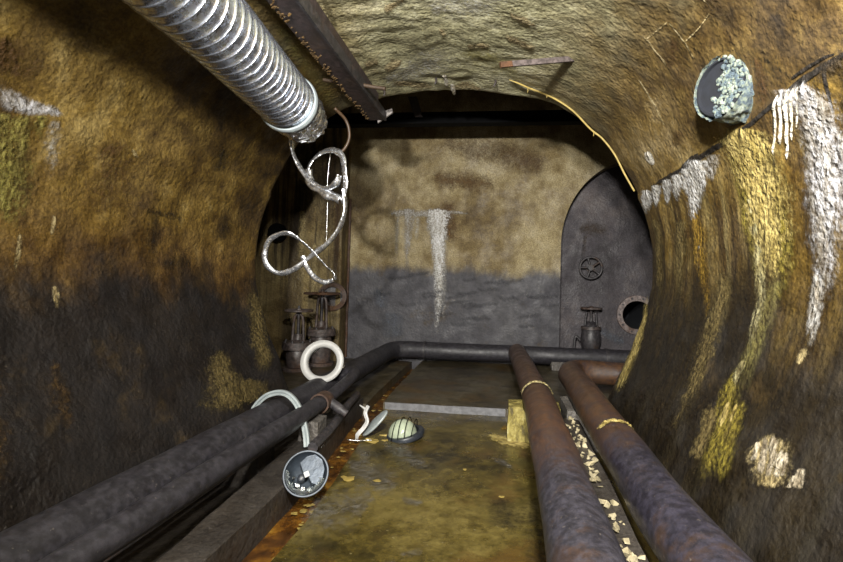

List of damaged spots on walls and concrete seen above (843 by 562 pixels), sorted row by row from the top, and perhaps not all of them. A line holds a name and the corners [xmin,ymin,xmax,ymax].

damp [0,91,60,219]
damp [393,209,463,327]
damp [641,155,729,398]
damp [694,54,792,326]
crack [651,52,843,187]
damp [778,84,843,338]
damp [690,361,746,476]